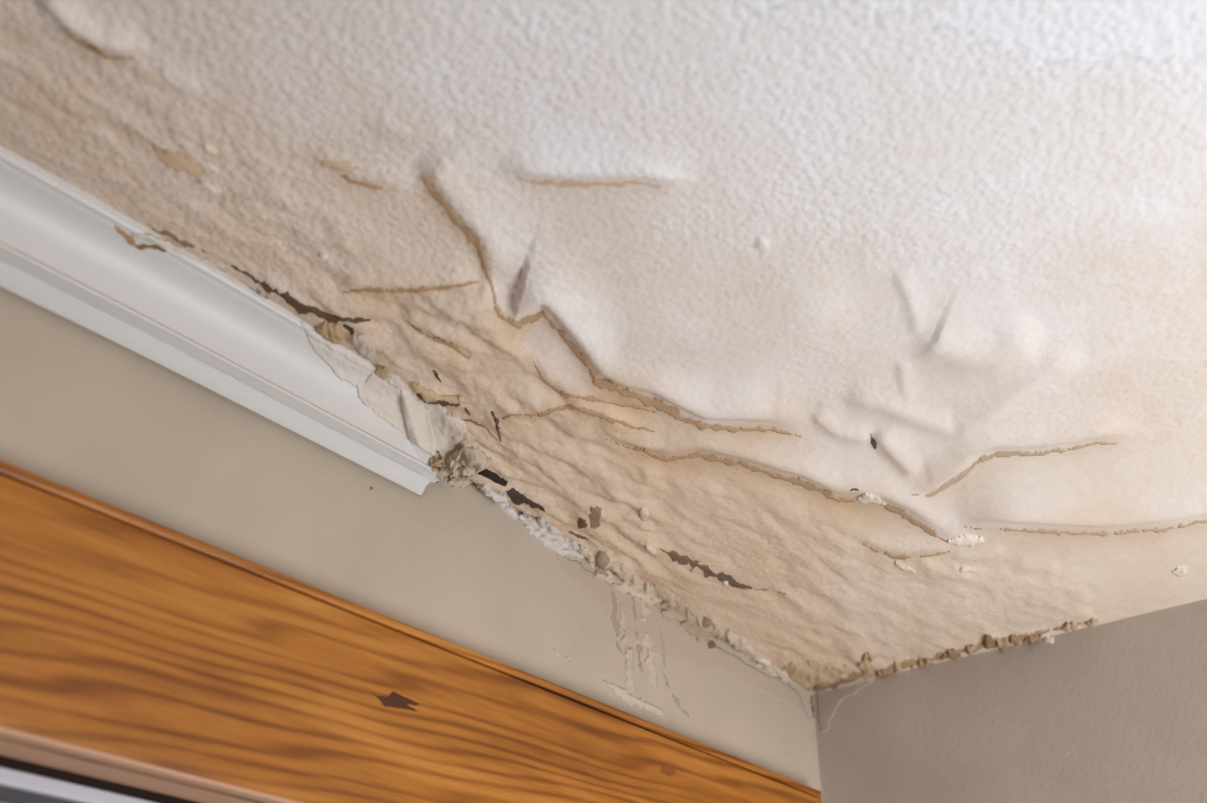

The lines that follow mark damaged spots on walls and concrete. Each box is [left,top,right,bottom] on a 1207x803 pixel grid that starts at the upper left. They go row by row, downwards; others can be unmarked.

spalling [0,0,1112,693]
crack [416,370,501,441]
crack [568,531,589,540]
crack [660,549,786,595]
water stain [556,543,1063,733]